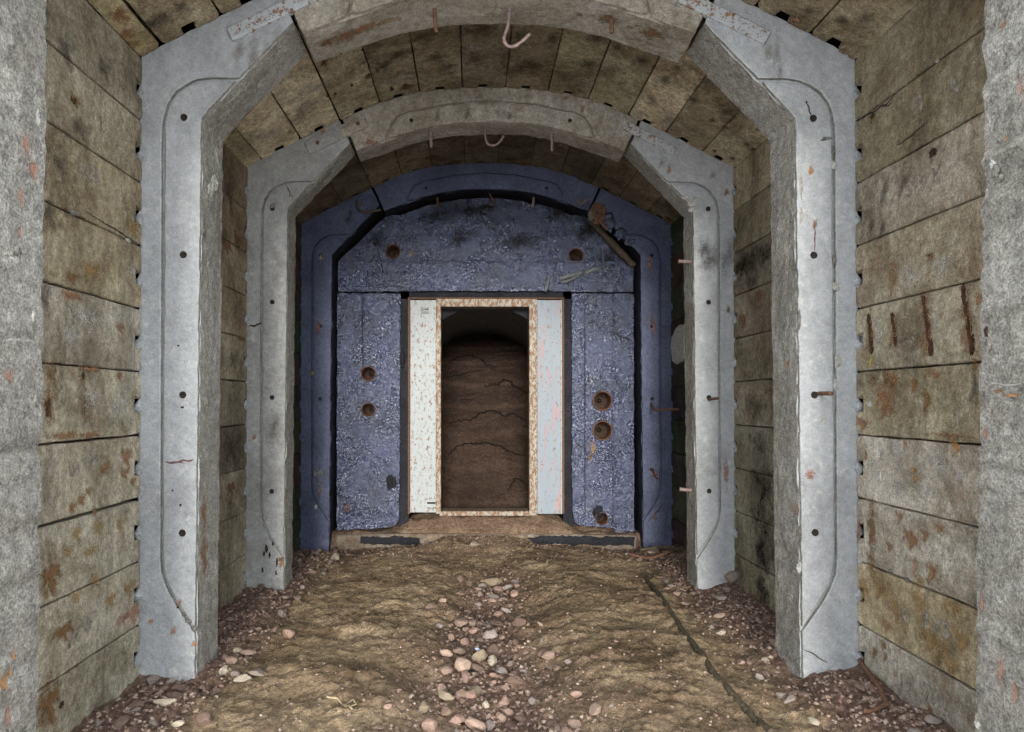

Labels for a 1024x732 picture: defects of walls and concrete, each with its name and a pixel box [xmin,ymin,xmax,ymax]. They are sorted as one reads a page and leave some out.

rust [872,373,931,417]
rust [40,529,95,600]
rust [53,620,73,642]
rust [38,681,59,728]